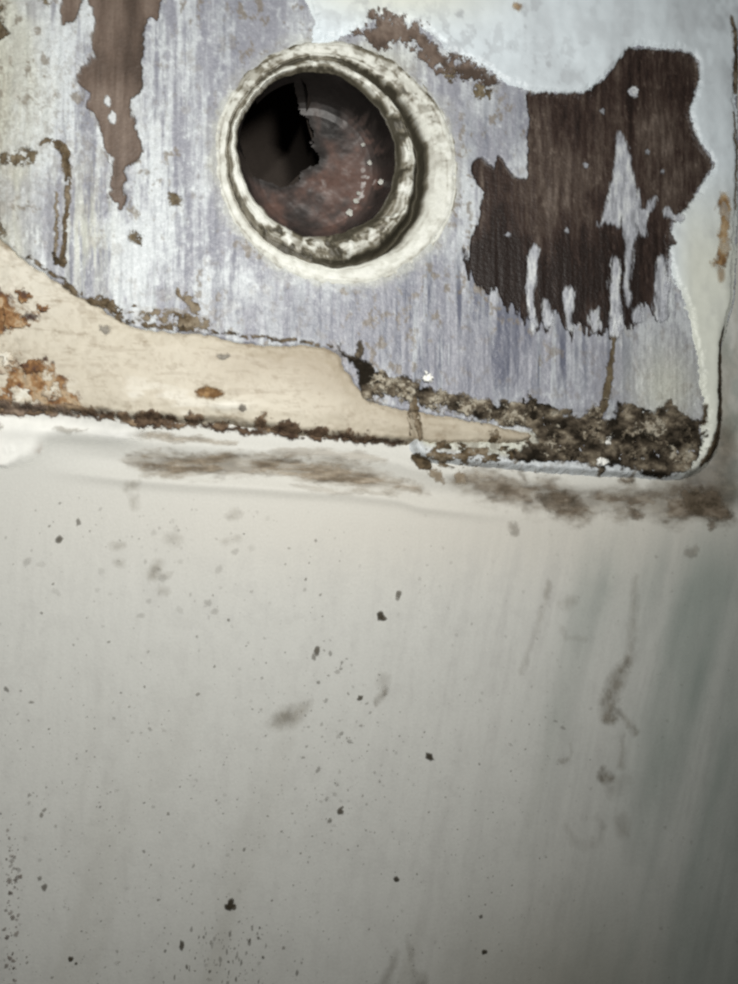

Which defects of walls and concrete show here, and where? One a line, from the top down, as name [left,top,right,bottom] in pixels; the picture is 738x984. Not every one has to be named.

peeling [60,0,161,210]
peeling [168,192,181,205]
peeling [463,47,713,342]
peeling [128,231,142,246]
corrosion [714,194,731,266]
corrosion [0,290,48,334]
corrosion [0,351,407,446]
spalling [195,386,223,399]
leakage [138,453,237,474]
leakage [244,457,384,485]
leakage [429,469,588,517]
leakage [594,476,730,529]